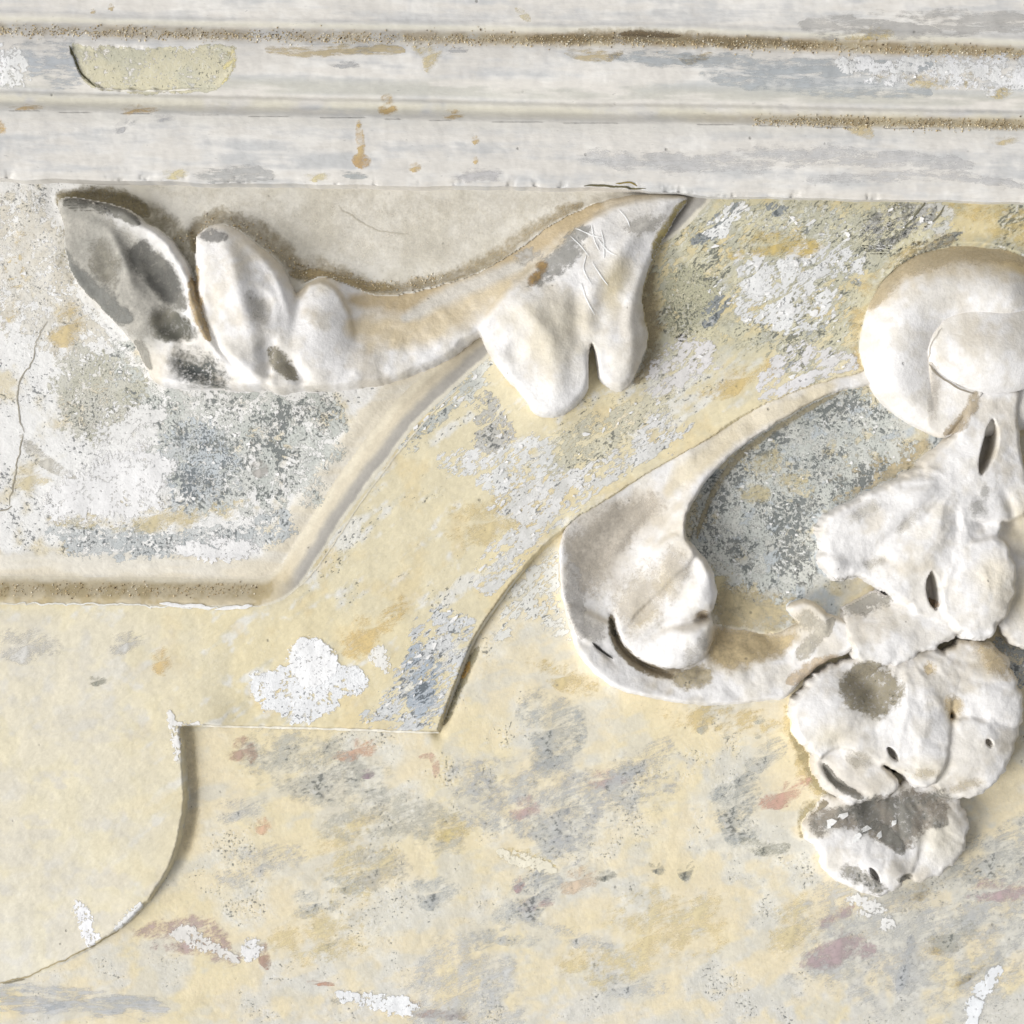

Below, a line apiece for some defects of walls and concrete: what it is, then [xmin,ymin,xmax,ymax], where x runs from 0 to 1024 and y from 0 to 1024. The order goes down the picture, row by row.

spalling [69,43,237,95]
peeling [834,52,1024,96]
crack [0,322,47,511]
peeling [0,188,348,563]
peeling [398,199,956,605]
peeling [359,604,476,732]
leakage [849,661,881,678]